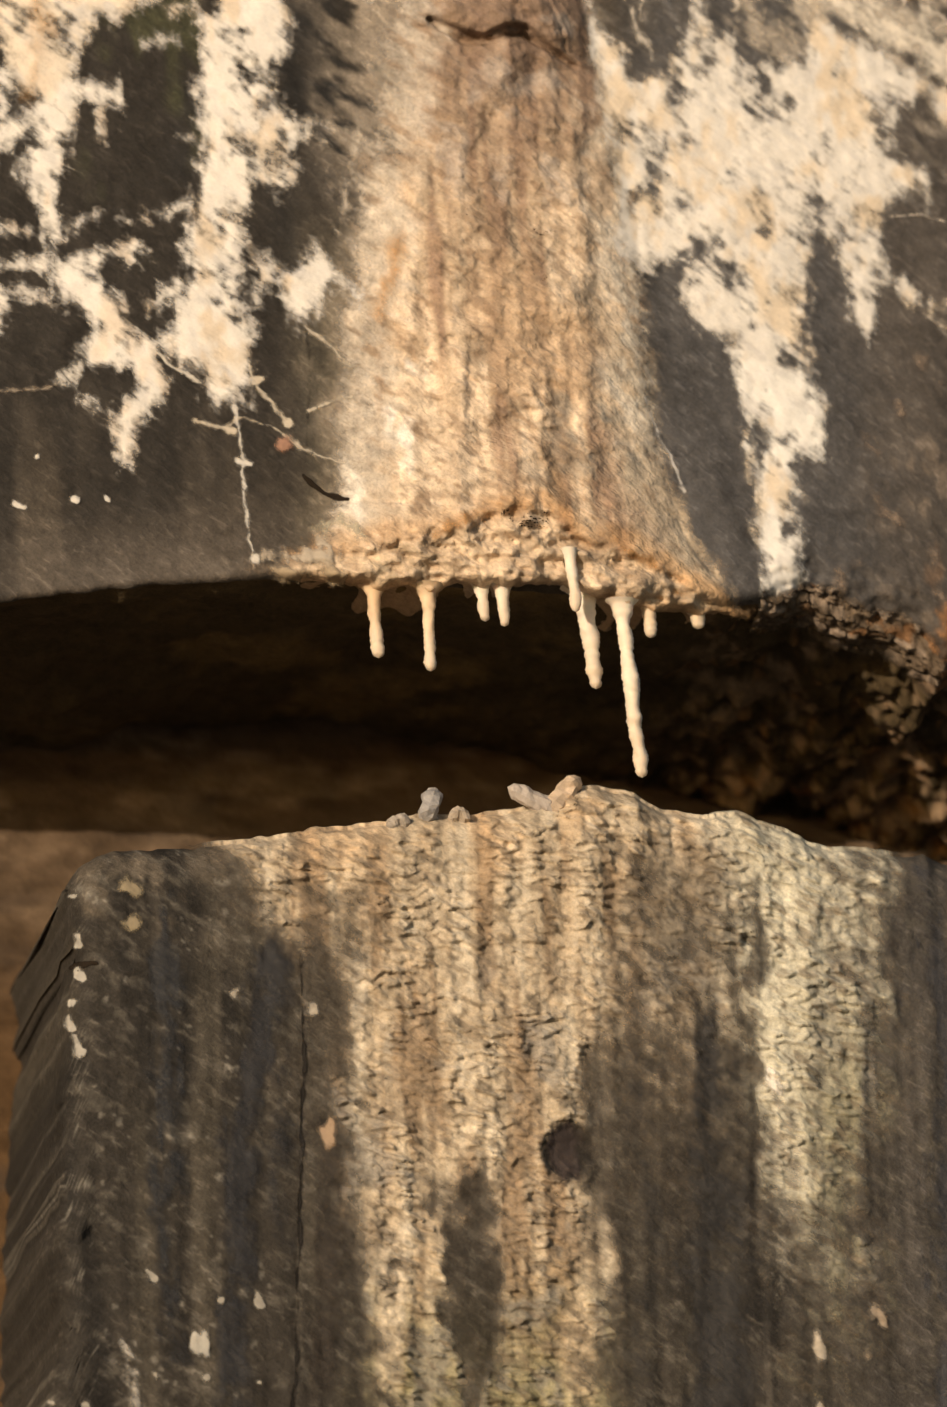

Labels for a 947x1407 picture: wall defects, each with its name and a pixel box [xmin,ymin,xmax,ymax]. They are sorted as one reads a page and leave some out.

water stain [0,0,947,632]
spalling [750,585,947,699]
water stain [147,908,184,1317]
crack [295,953,307,1287]
water stain [202,785,927,1407]
water stain [122,1340,140,1407]
crack [290,1334,300,1407]